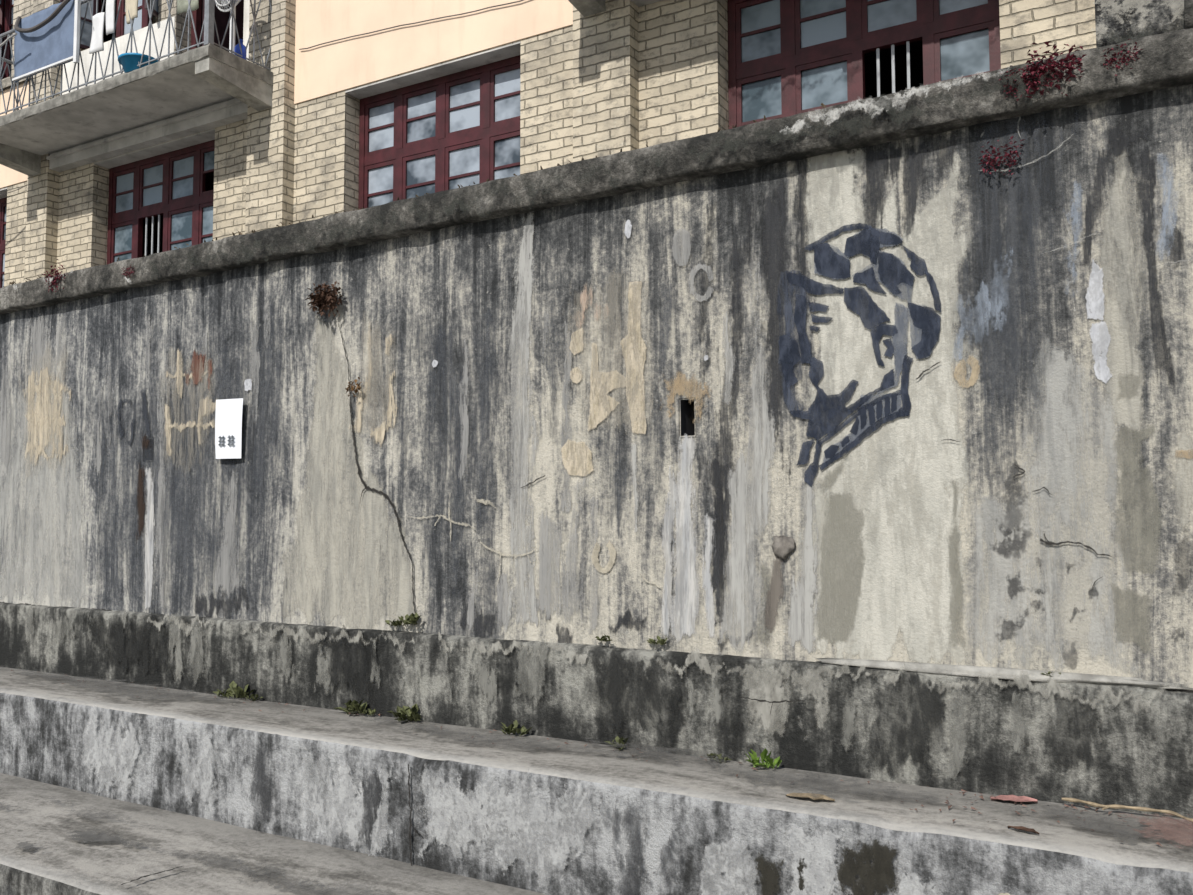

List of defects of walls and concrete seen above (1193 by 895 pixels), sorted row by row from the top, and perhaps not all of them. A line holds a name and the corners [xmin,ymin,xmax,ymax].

spalling [672,228,714,301]
water stain [1071,128,1183,385]
water stain [12,393,240,700]
crack [338,323,538,625]
peeling [438,632,588,665]
water stain [459,212,598,704]
peeling [663,649,724,678]
water stain [661,158,807,650]
water stain [585,652,965,800]
peeling [737,149,1156,734]
crack [1040,533,1112,589]
crack [1166,687,1193,695]